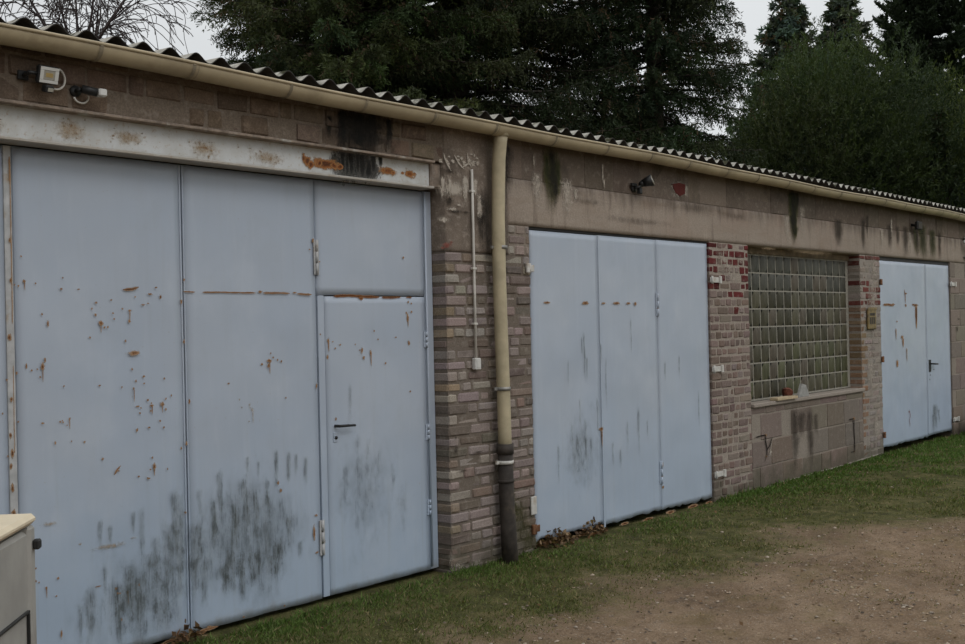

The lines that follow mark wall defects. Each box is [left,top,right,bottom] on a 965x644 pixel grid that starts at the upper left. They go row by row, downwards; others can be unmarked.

corrosion [302,153,343,170]
damp [326,111,392,185]
corrosion [379,167,416,179]
damp [533,152,577,212]
damp [786,193,804,235]
corrosion [6,358,46,402]
corrosion [121,368,172,432]
damp [792,413,817,453]